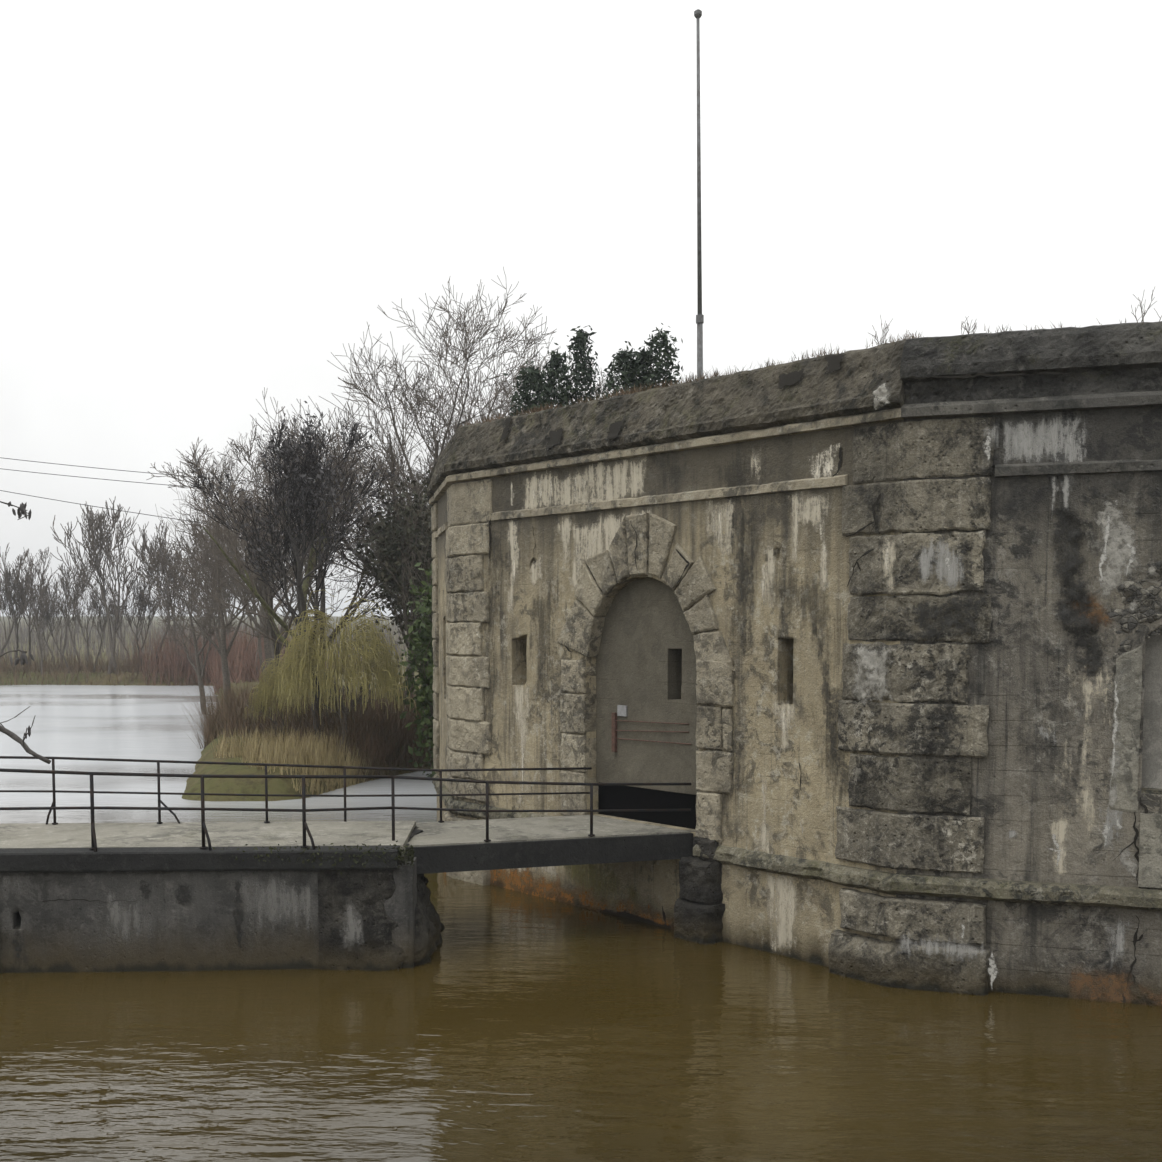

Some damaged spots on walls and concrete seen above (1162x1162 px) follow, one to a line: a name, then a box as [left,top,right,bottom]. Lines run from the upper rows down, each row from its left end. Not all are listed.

water stain [984,416,1087,463]
water stain [1052,475,1069,510]
spalling [1052,500,1162,682]
peeling [1102,678,1138,880]
crack [1114,797,1148,888]
corrosion [490,868,674,927]
crack [1122,916,1144,1003]